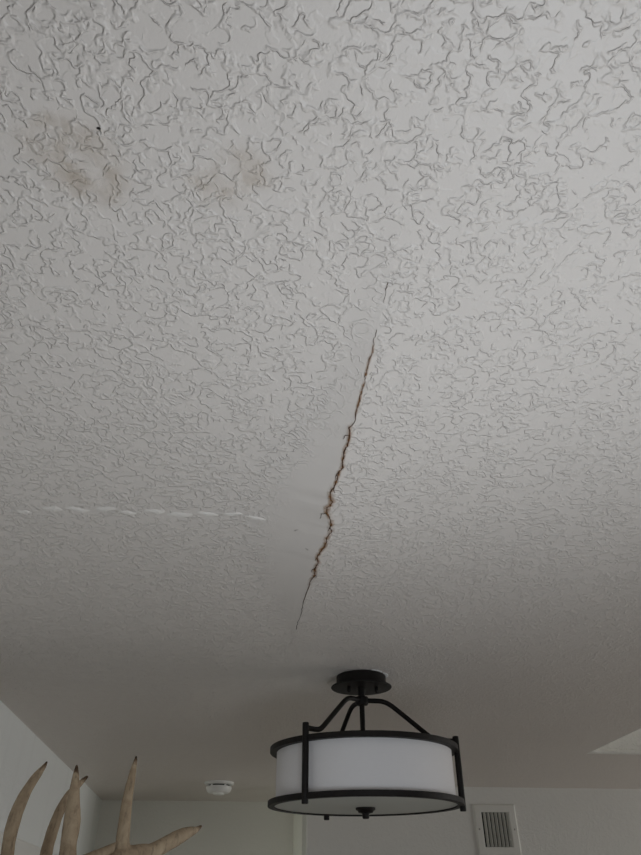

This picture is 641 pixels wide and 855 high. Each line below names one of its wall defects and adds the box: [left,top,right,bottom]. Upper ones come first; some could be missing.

crack [296,330,377,629]